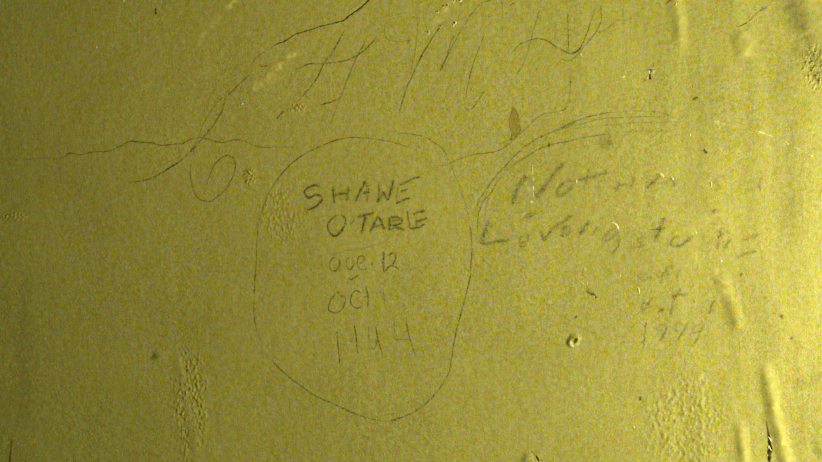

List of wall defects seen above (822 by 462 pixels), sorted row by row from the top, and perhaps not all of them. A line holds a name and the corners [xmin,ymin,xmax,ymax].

crack [276,0,376,45]